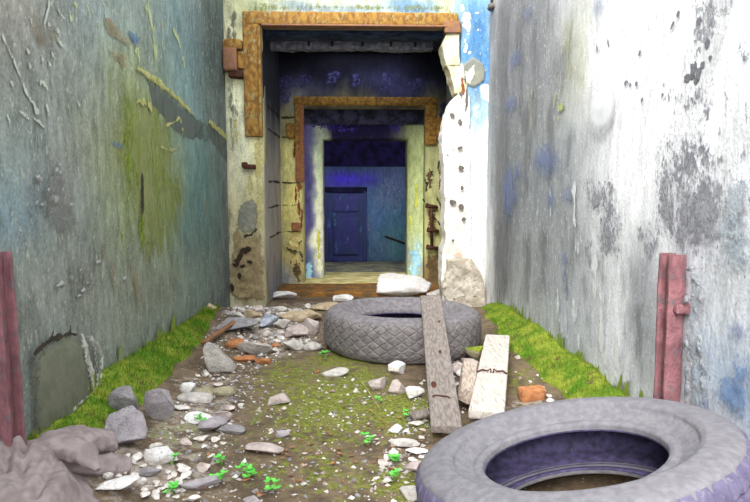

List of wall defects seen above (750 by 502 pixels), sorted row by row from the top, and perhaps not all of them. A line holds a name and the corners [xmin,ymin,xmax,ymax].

flaking render [136,66,228,161]
spalling [230,199,265,300]
rust [295,182,303,229]
spalling [438,4,489,307]